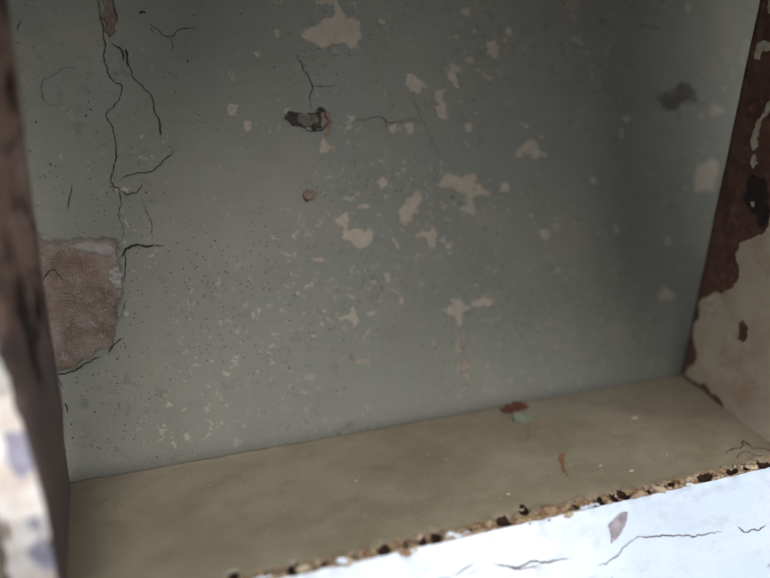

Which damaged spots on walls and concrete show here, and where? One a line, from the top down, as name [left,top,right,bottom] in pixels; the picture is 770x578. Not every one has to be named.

crack [139,10,200,51]
crack [97,0,173,277]
corrosion [744,175,769,226]
crack [58,338,124,412]
peeling [0,361,56,578]
spalling [646,473,713,494]
spalling [726,460,770,476]
spalling [376,528,473,556]
spalling [497,515,513,527]
spalling [542,490,630,521]
peeling [608,512,628,543]
crack [602,525,766,565]